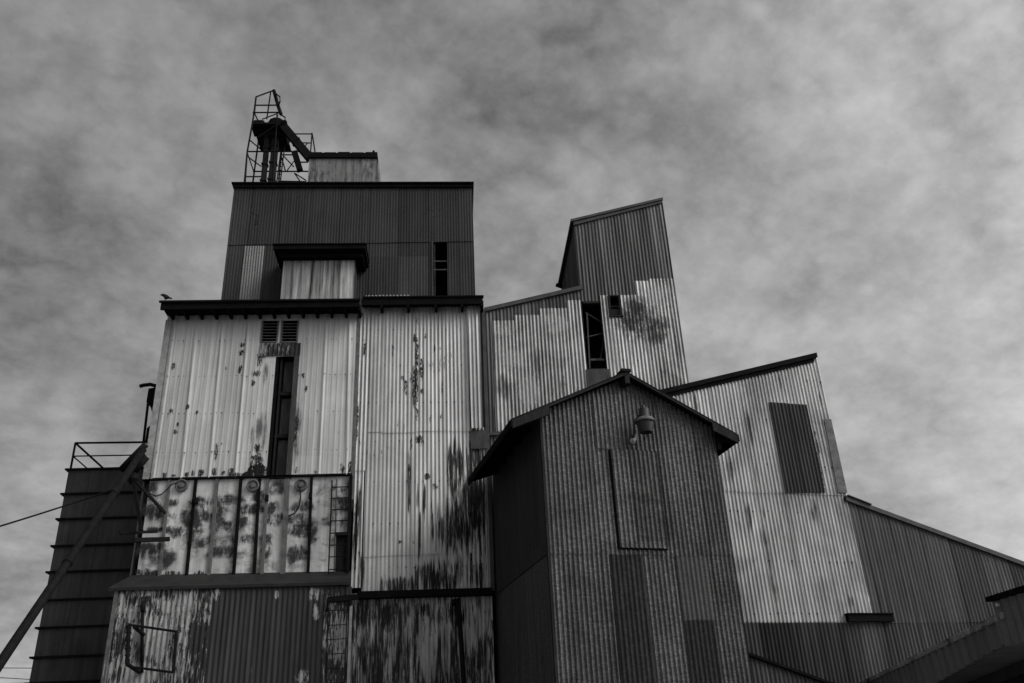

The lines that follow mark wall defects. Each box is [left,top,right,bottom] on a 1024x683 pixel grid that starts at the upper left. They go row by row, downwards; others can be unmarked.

rust [238,342,268,386]
rust [401,320,442,418]
rust [150,421,267,478]
rust [352,490,487,683]
rust [110,627,152,683]